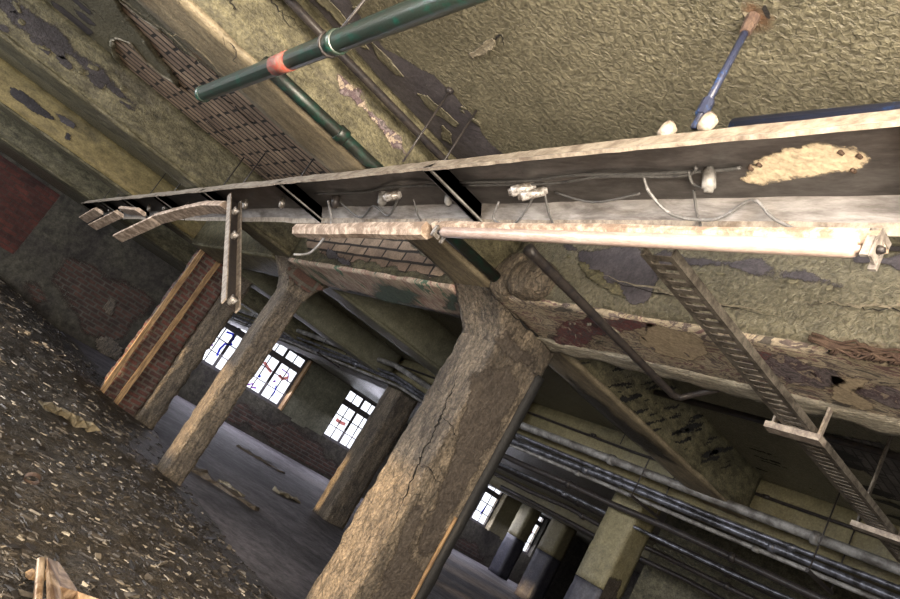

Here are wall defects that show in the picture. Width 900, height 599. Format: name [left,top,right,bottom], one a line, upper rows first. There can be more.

peeling [10,87,76,141]
peeling [0,0,140,111]
spalling [109,0,331,181]
peeling [309,0,361,28]
peeling [355,40,503,159]
peeling [752,345,900,410]
crack [390,369,459,530]